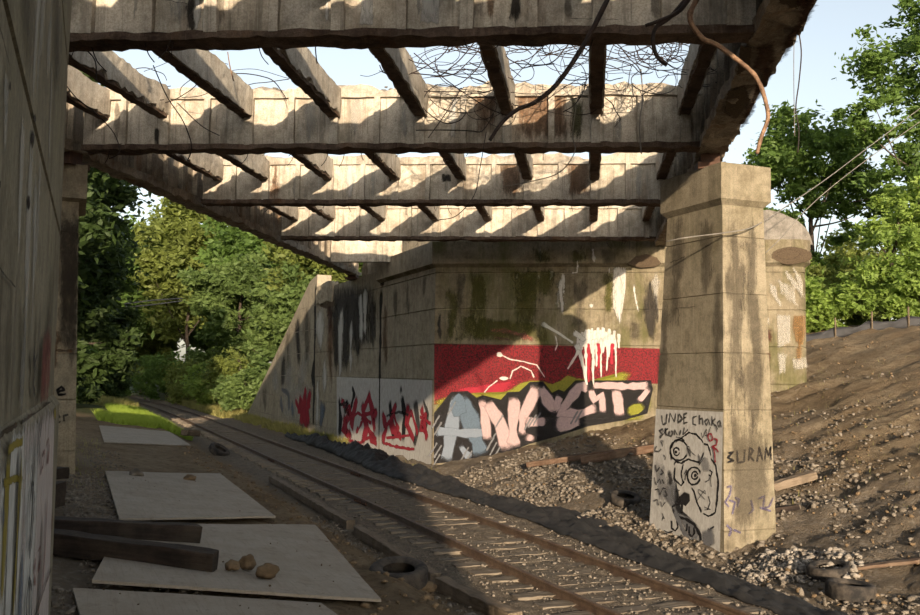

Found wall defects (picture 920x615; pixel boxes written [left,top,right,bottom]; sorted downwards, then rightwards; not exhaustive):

leakage [186,0,204,30]
leakage [509,0,520,21]
spalling [737,44,777,75]
spalling [724,87,751,119]
leakage [60,219,79,342]
leakage [437,247,596,342]